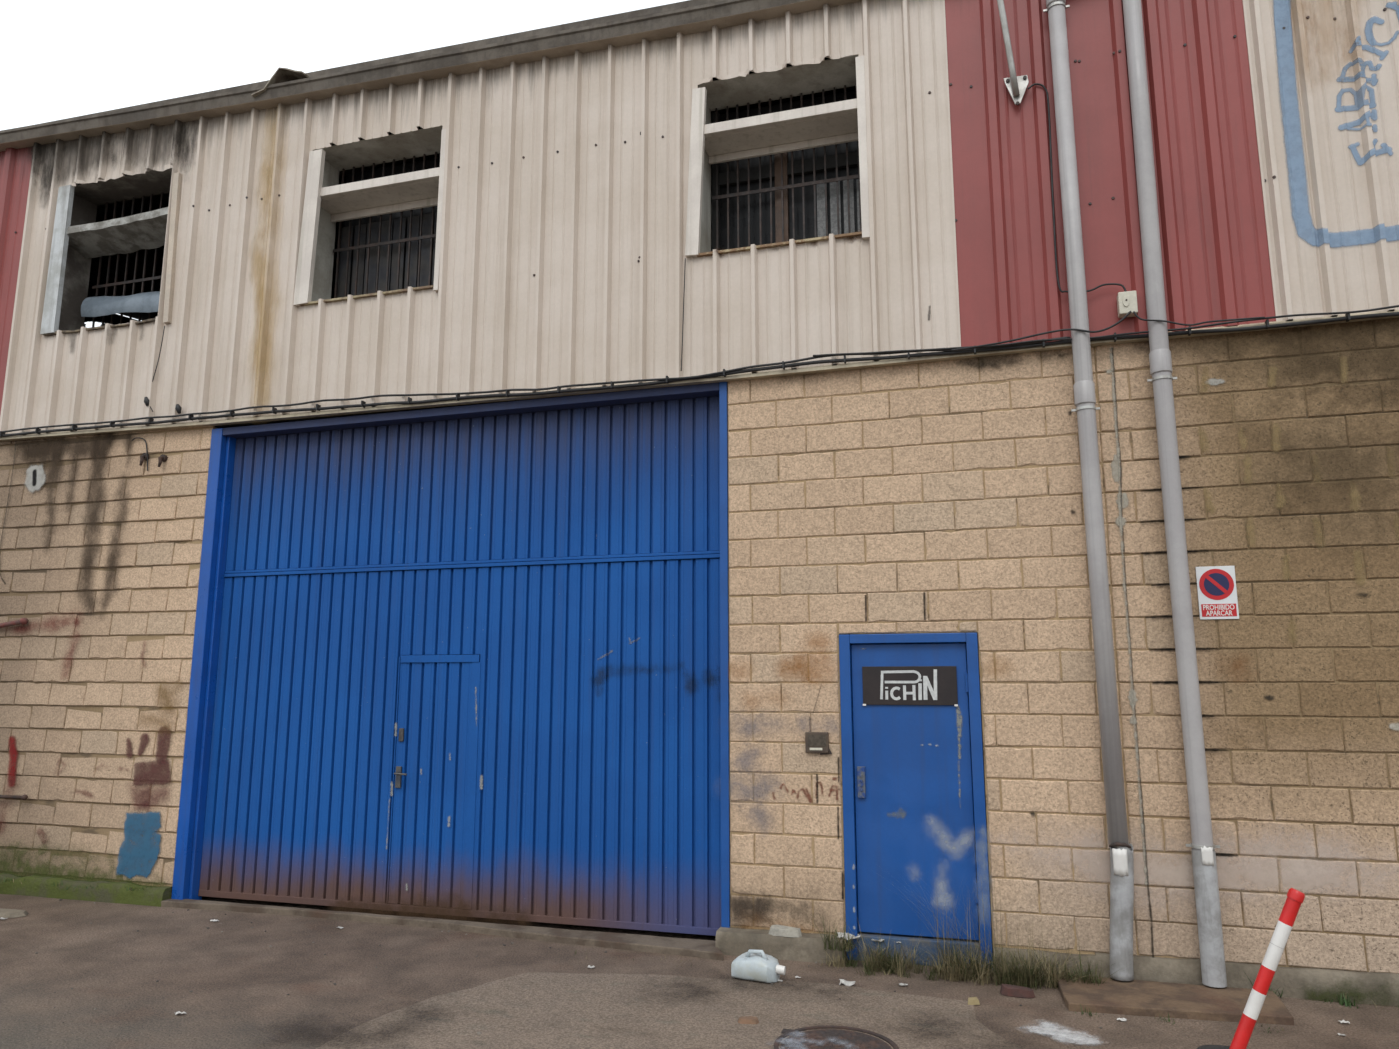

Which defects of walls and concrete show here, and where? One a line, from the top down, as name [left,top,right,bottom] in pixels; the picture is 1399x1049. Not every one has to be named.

water stain [32,124,188,195]
water stain [21,433,132,611]